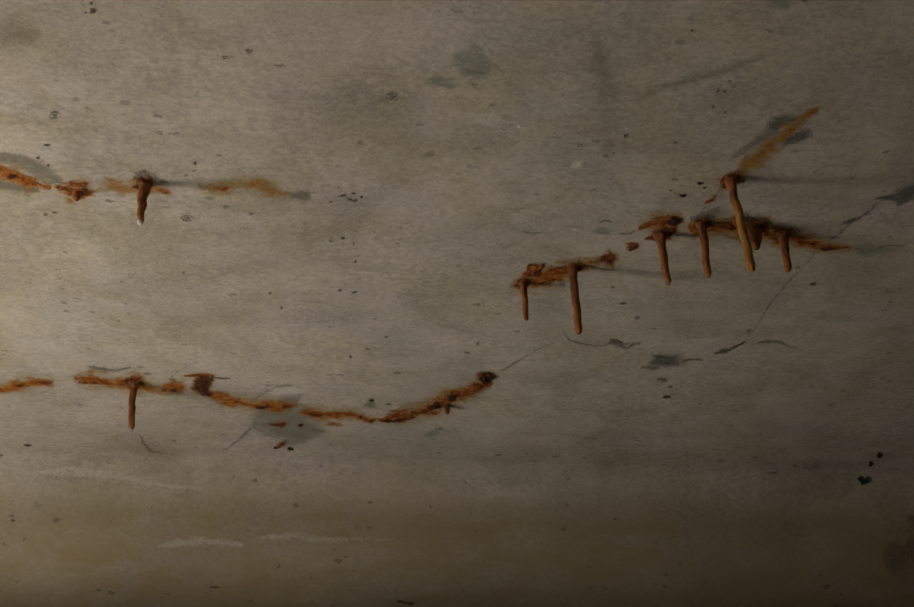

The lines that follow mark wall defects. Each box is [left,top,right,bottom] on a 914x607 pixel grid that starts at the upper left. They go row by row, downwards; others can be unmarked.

rust [0,151,171,208]
rust [196,172,312,201]
rust [511,183,853,298]
rust [0,372,60,395]
rust [73,366,500,431]